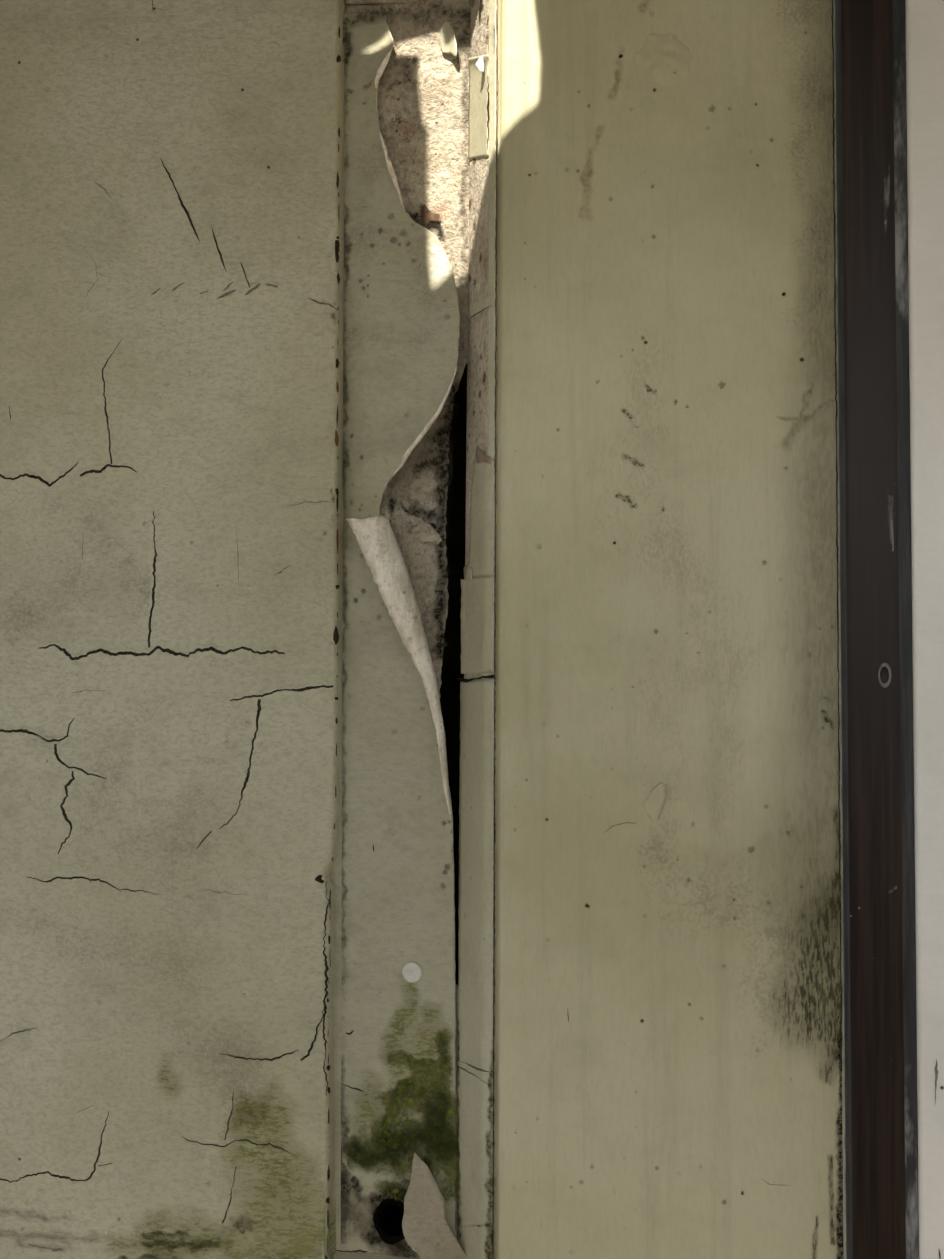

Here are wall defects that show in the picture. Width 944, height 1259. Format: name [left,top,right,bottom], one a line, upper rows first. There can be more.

crack [160,158,250,288]
crack [0,338,139,491]
crack [0,511,334,898]
peeling [315,0,497,1259]
crack [219,882,365,1094]
damp [778,873,844,1259]
crack [0,1105,113,1187]
crack [182,1088,294,1223]
damp [341,1121,416,1258]